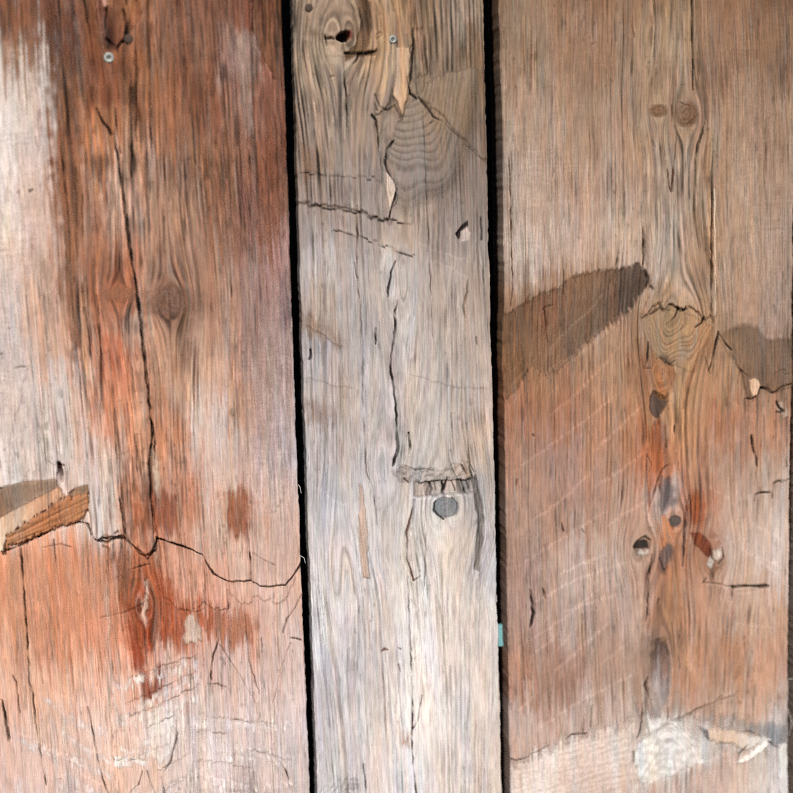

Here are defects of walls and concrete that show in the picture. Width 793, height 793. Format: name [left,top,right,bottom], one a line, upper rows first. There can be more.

crack [324,35,377,63]
crack [408,84,437,119]
crack [315,115,419,482]
crack [115,145,156,517]
peeling [750,378,761,396]
crack [754,387,783,412]
spalling [0,455,123,553]
spalling [392,461,483,570]
crack [152,537,224,579]
peeling [707,550,722,569]
spalling [510,716,771,793]
spalling [778,743,788,793]